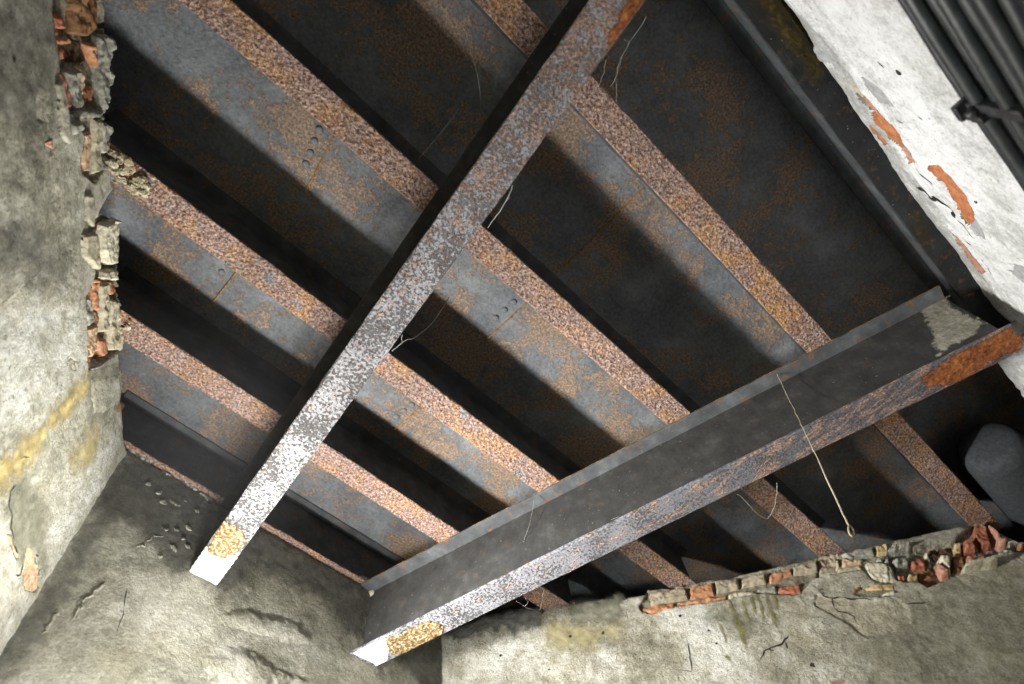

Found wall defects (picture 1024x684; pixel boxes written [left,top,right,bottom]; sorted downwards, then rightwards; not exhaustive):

rust [607,0,643,45]
flaking render [850,77,915,164]
flaking render [35,0,124,374]
flaking render [927,165,986,240]
flaking render [952,233,986,274]
rust [922,328,1023,388]
water stain [0,369,120,565]
spalling [638,523,1024,638]
crack [820,592,873,623]